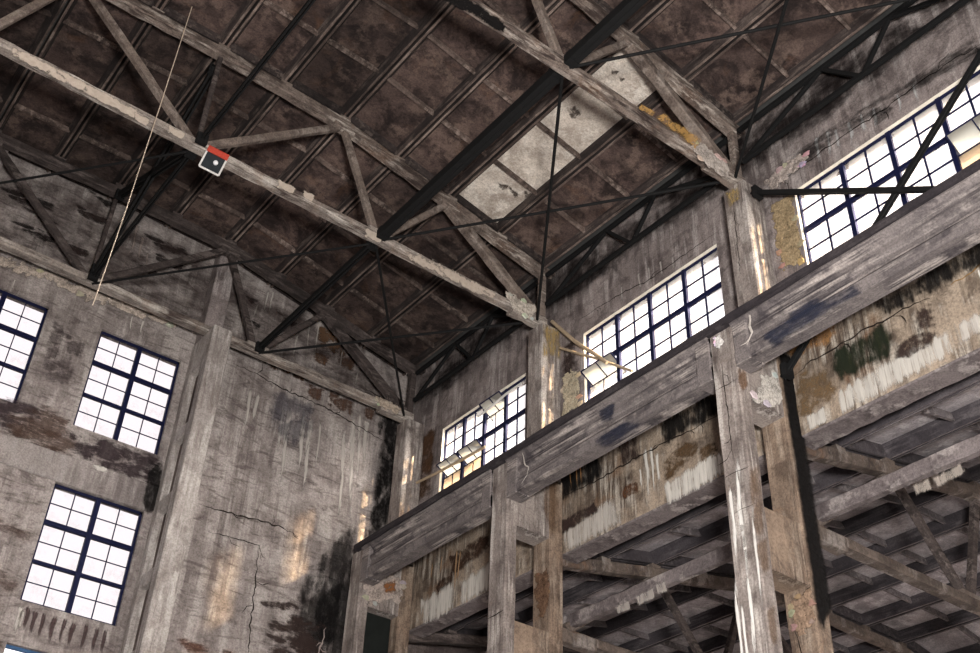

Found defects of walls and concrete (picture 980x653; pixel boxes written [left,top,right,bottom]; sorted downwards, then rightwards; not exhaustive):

peeling [12,48,149,125]
peeling [277,180,314,202]
peeling [764,150,810,189]
peeling [365,228,381,242]
peeling [770,195,805,271]
peeling [409,254,537,320]
damp [797,309,951,429]
damp [0,399,159,483]
damp [619,438,723,504]
damp [562,501,620,549]
crack [200,504,297,652]
damp [261,601,326,653]